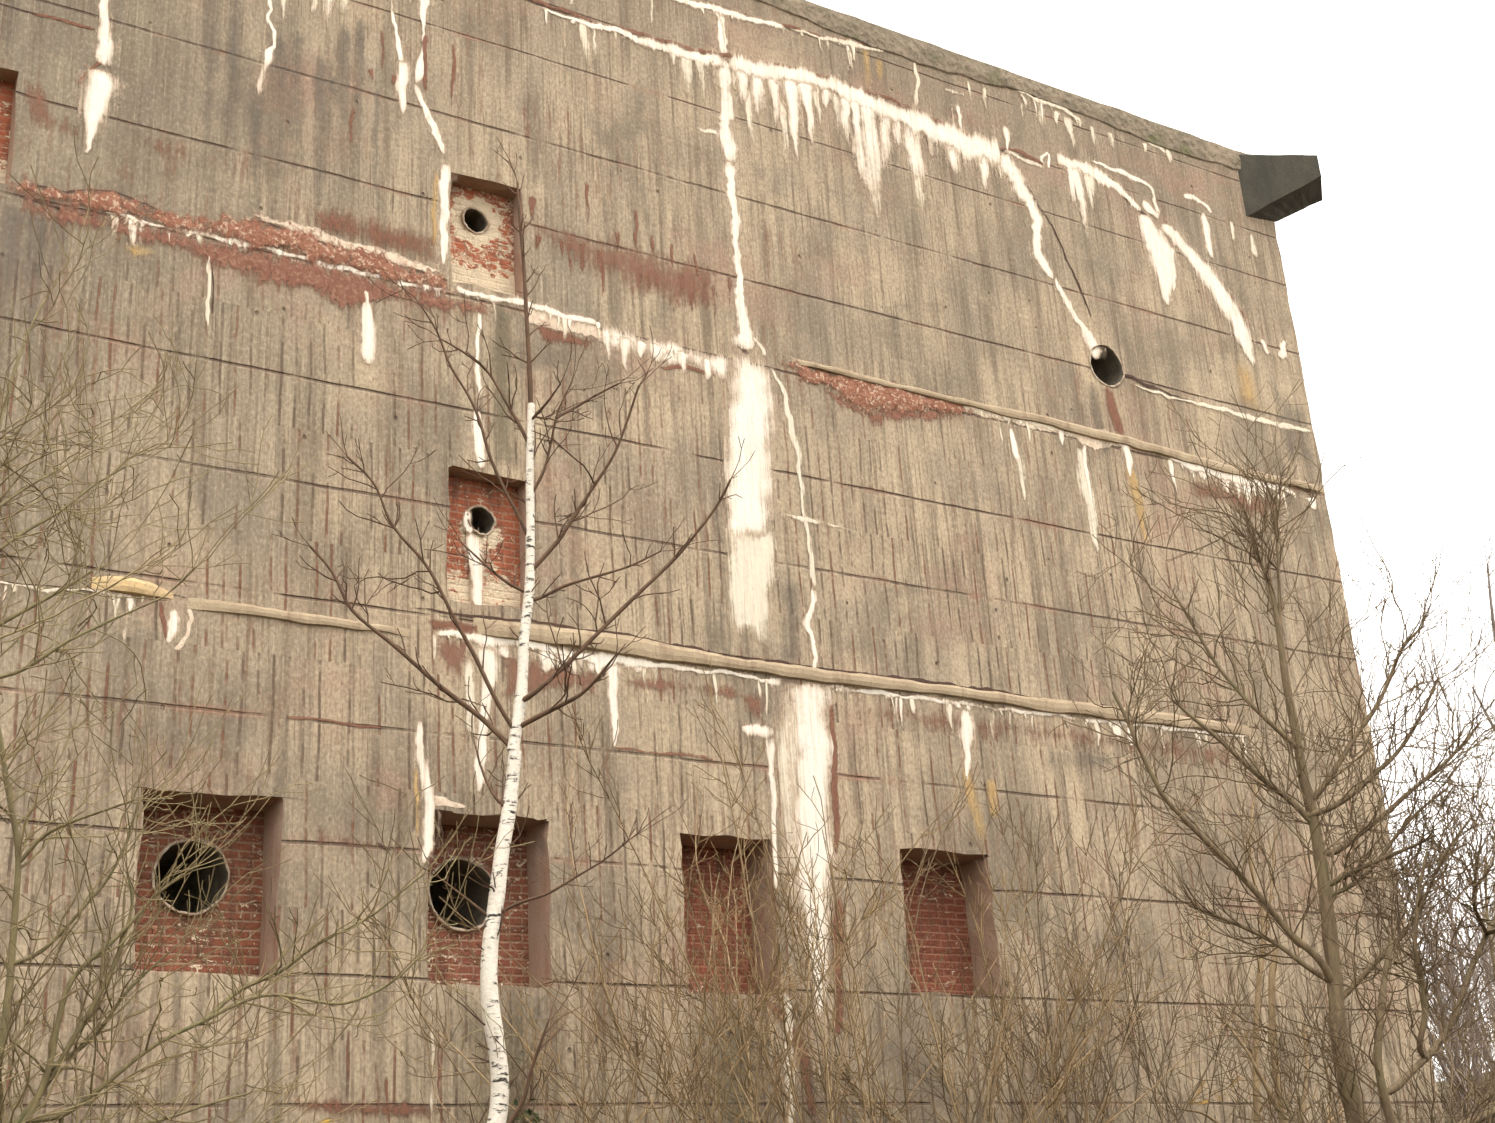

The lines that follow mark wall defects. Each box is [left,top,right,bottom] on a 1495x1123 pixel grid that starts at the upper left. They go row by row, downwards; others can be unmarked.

efflorescence [311,0,348,21]
efflorescence [78,0,124,153]
efflorescence [1018,91,1114,147]
efflorescence [1142,142,1172,163]
spalling [6,174,458,300]
efflorescence [1184,193,1258,258]
water stain [106,212,779,652]
spalling [782,362,976,426]
water stain [963,387,1146,552]
water stain [413,721,466,863]
water stain [433,629,1247,1017]
water stain [782,993,798,1123]